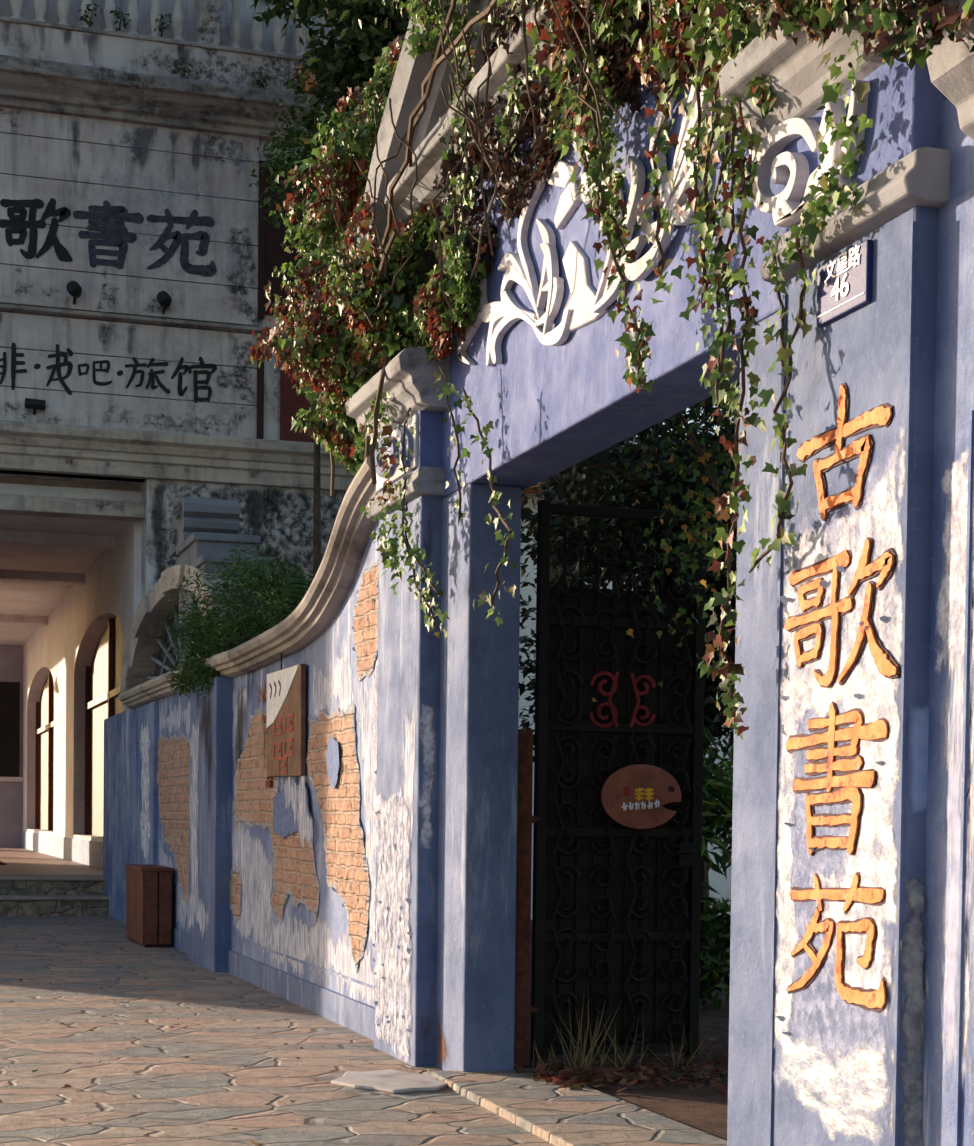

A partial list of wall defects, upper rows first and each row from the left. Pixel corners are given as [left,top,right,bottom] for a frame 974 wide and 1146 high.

leakage [125,129,156,166]
leakage [192,136,243,167]
leakage [227,229,257,322]
leakage [153,485,344,588]
flaking render [140,697,209,937]
flaking render [229,559,435,1063]
peeling [774,431,928,1146]
peeling [935,447,974,1074]